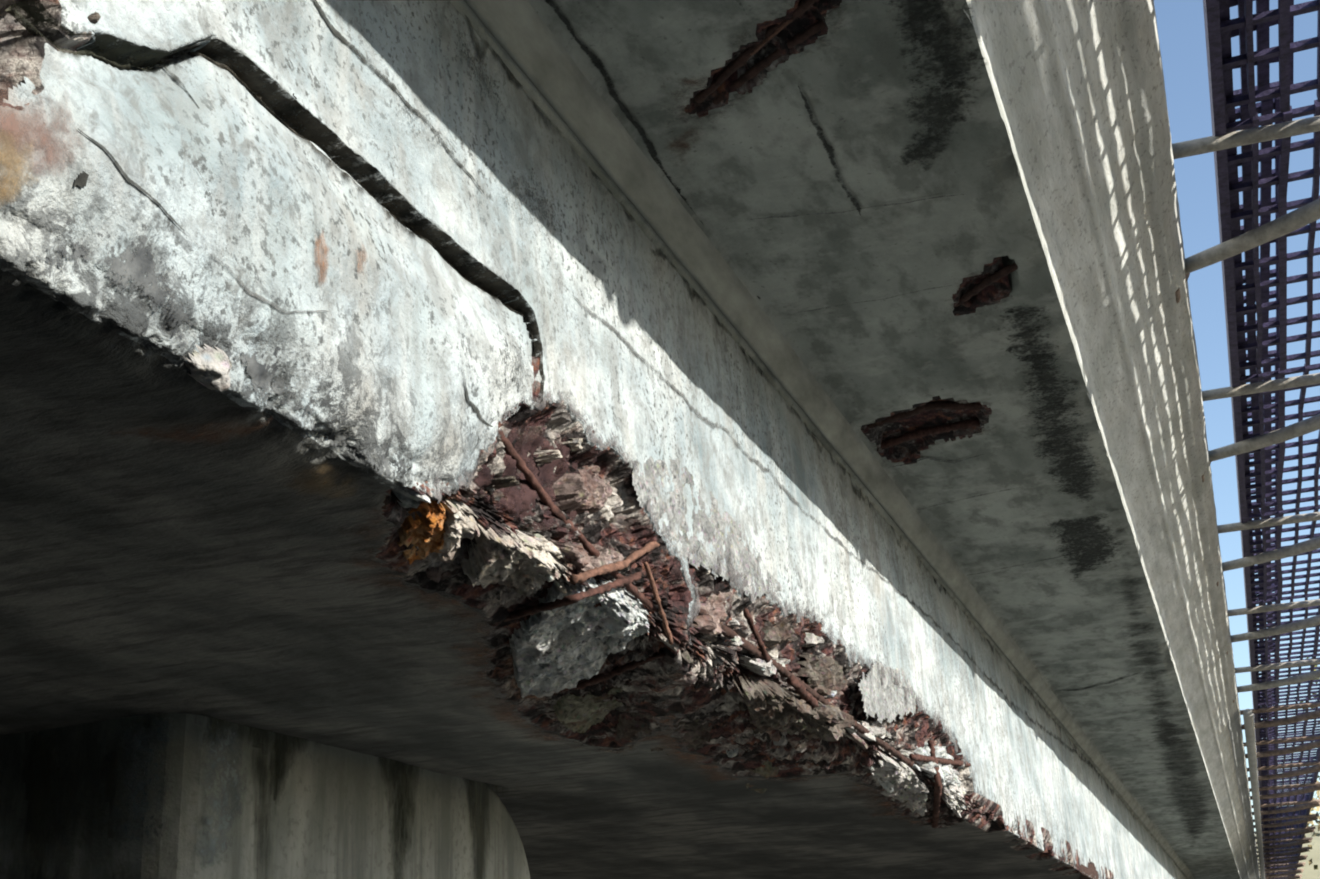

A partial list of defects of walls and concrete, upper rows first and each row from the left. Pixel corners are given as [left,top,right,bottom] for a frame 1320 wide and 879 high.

spalling [0,0,101,111]
spalling [684,0,842,118]
water stain [892,0,986,169]
crack [6,0,544,403]
peeling [18,215,197,357]
spalling [952,257,1018,316]
crack [464,377,493,427]
water stain [1000,307,1120,582]
spalling [224,335,1114,879]
water stain [210,717,307,865]
water stain [379,757,418,879]
water stain [467,779,506,879]